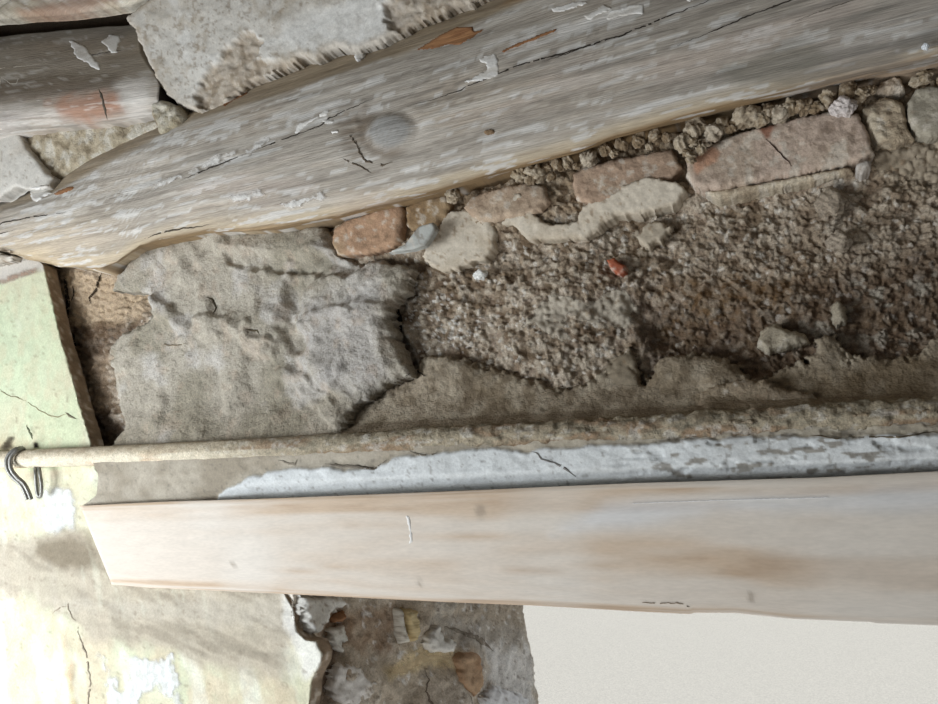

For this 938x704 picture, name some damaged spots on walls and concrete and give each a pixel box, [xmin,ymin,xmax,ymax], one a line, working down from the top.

crack [396,309,404,333]
crack [0,390,76,438]
crack [52,604,91,704]
peeling [106,653,181,704]